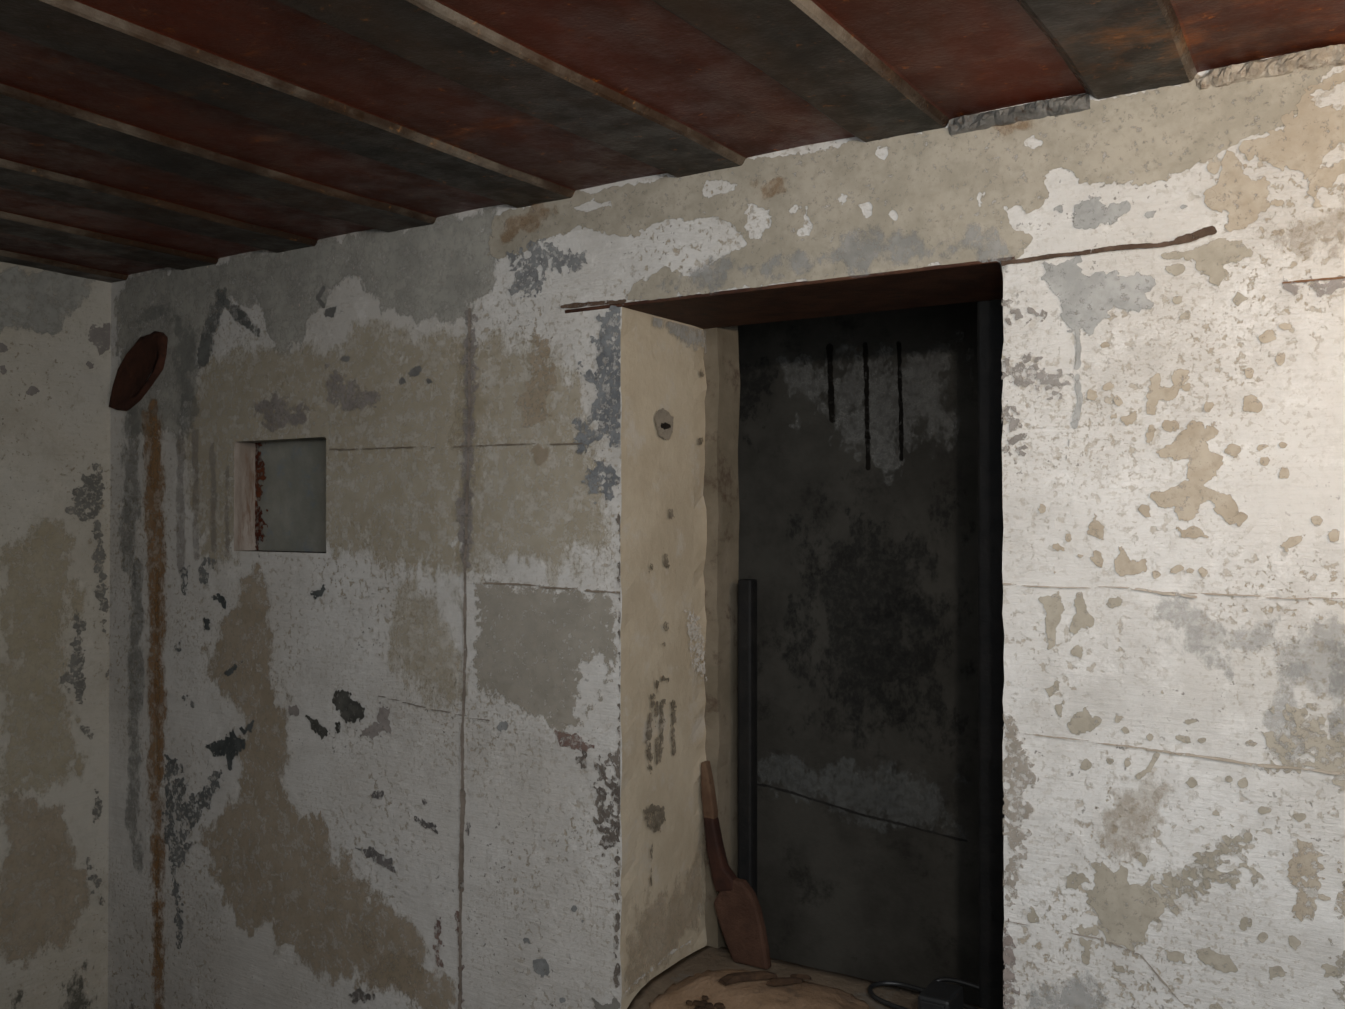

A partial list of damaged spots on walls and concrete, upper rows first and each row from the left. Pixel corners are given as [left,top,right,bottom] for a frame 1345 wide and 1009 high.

crack [1001,226,1217,266]
corrosion [255,443,268,550]
peeling [456,44,1345,1009]
peeling [60,463,109,704]
water stain [114,206,610,1009]
corrosion [143,399,167,1009]
spalling [288,689,391,740]
spalling [205,720,254,771]
peeling [414,800,438,834]
peeling [355,846,395,873]
spalling [349,988,375,1005]